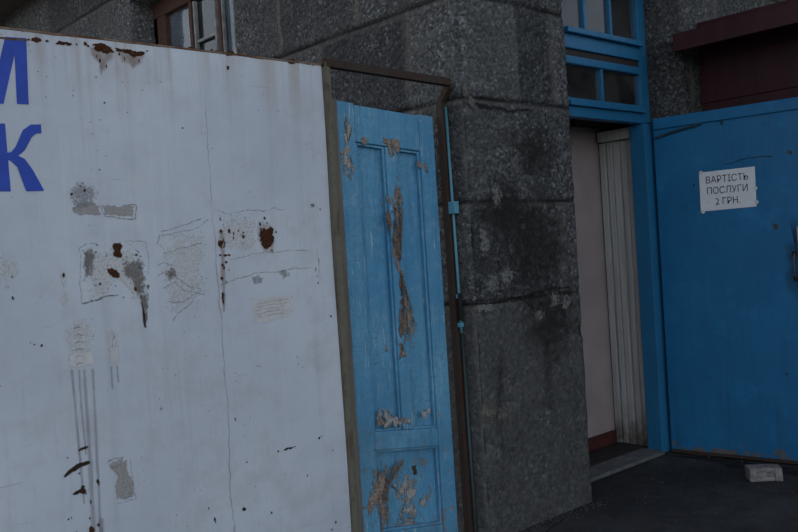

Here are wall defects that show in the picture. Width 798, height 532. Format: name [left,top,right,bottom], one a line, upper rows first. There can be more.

rust [0,37,148,68]
peeling [340,115,355,181]
rust [259,217,277,251]
peeling [382,176,417,360]
damp [476,178,572,348]
peeling [377,407,410,430]
peeling [363,459,426,532]